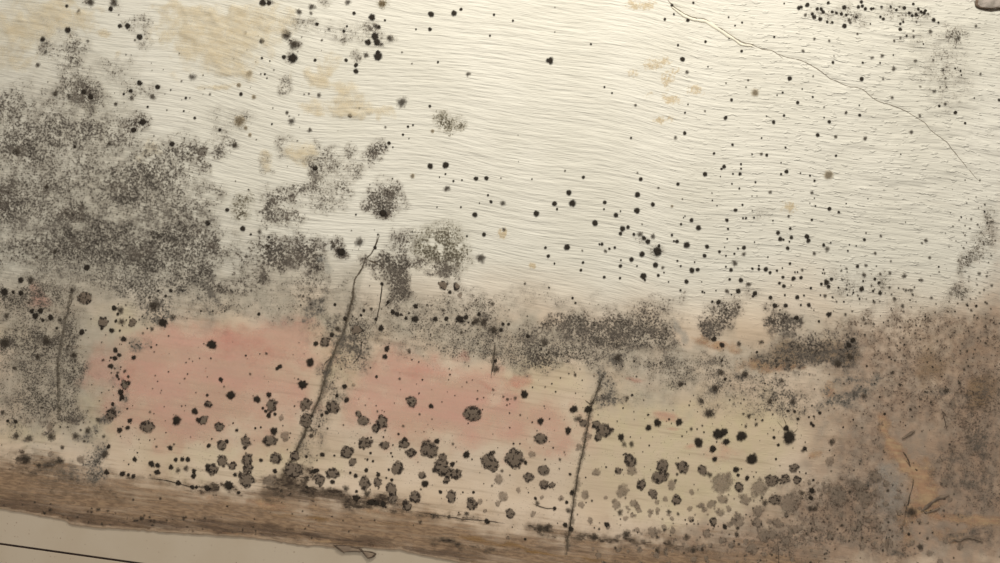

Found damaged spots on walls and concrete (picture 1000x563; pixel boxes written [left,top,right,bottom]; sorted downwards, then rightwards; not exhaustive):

mould [237,0,393,98]
mould [429,105,464,136]
crack [668,0,977,179]
mould [797,0,977,124]
mould [355,174,406,235]
mould [428,162,501,191]
mould [599,172,669,282]
mould [772,215,832,255]
crack [282,235,394,478]
crack [565,373,604,549]